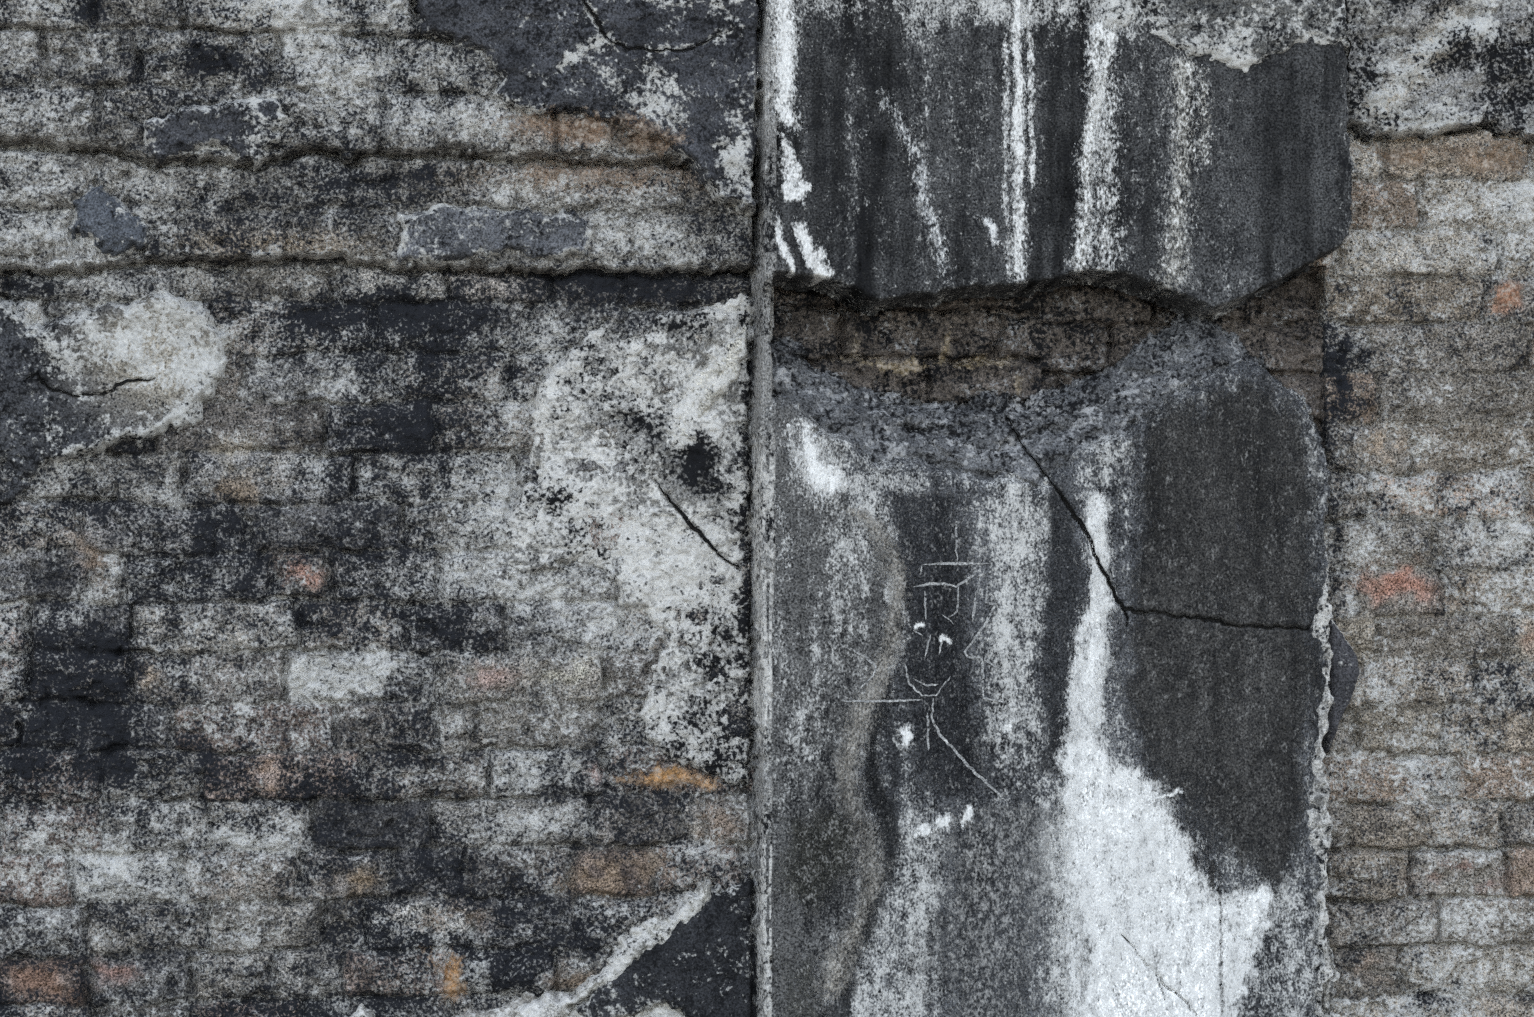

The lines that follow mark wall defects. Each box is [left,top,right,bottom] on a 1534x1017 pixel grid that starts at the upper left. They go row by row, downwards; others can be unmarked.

water stain [760,0,835,286]
water stain [876,91,946,276]
water stain [984,0,1037,283]
water stain [1067,21,1126,277]
water stain [1139,57,1213,292]
crack [655,480,741,569]
flaking render [502,266,1324,789]
crack [1005,415,1309,630]
water stain [773,365,1331,1017]
flaking render [350,1003,375,1017]
flaking render [451,878,757,1017]